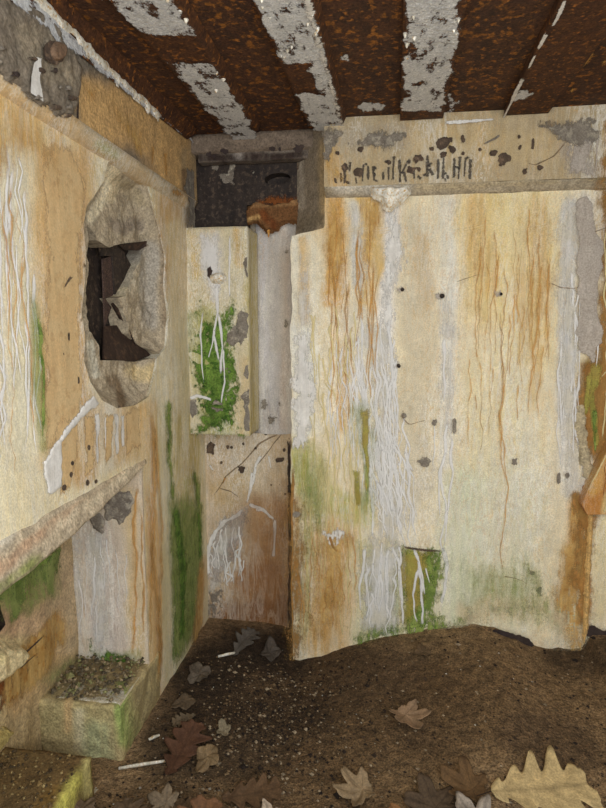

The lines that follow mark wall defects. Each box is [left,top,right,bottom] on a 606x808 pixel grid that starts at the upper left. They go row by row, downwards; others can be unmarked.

corrosion [596,155,606,218]
spalling [42,143,167,495]
water stain [199,234,231,402]
corrosion [326,201,379,398]
water stain [207,456,276,618]
crack [215,435,280,496]
water stain [290,207,430,634]
corrosion [556,230,606,650]